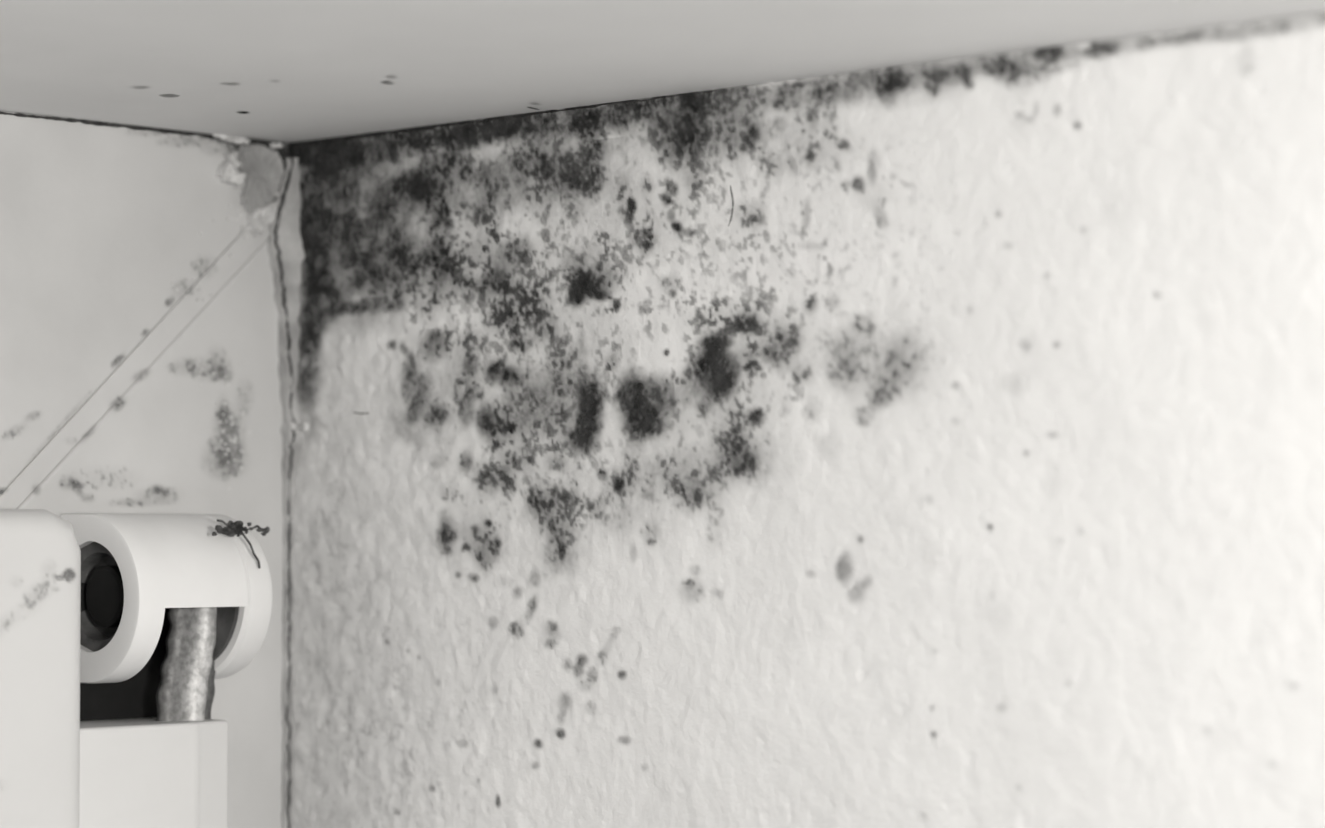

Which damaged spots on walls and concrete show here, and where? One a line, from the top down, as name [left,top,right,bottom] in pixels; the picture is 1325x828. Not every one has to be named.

damp [1086,42,1115,54]
damp [877,72,908,92]
damp [991,59,1016,79]
damp [218,88,748,385]
damp [699,319,781,398]
damp [410,392,443,419]
damp [479,413,511,444]
damp [558,381,602,451]
damp [619,378,663,438]
damp [749,411,761,423]
damp [530,495,565,559]